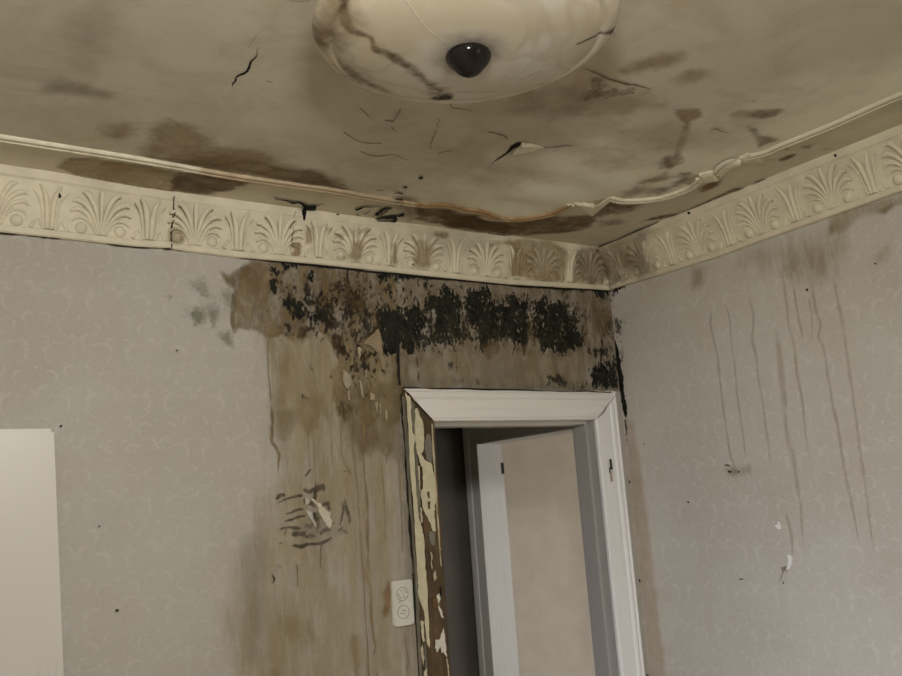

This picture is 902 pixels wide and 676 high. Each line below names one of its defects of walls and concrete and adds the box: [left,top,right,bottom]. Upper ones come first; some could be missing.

crack [232,35,272,86]
damp [62,124,345,194]
crack [344,108,408,161]
crack [489,132,569,163]
damp [677,109,700,123]
crack [274,197,321,254]
damp [222,179,766,676]
peeling [305,498,332,528]
peeling [402,393,450,676]